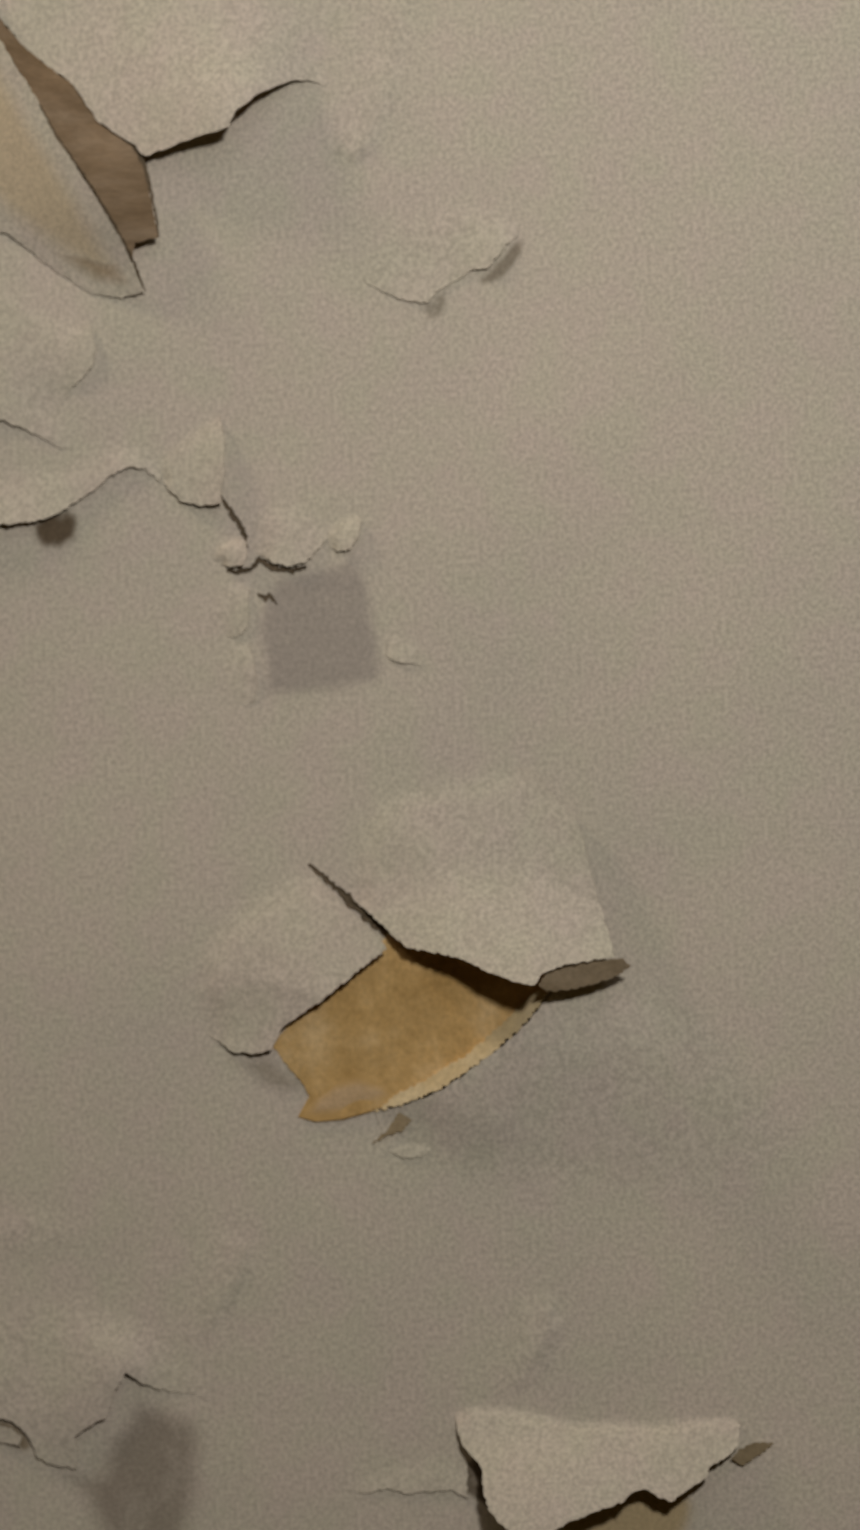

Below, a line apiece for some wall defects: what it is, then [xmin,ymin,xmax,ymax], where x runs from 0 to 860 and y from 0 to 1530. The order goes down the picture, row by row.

peeling [0,0,360,299]
peeling [356,192,527,327]
peeling [0,277,225,556]
spalling [205,492,422,711]
peeling [185,765,828,1210]
peeling [0,1286,220,1530]
peeling [345,1403,774,1530]